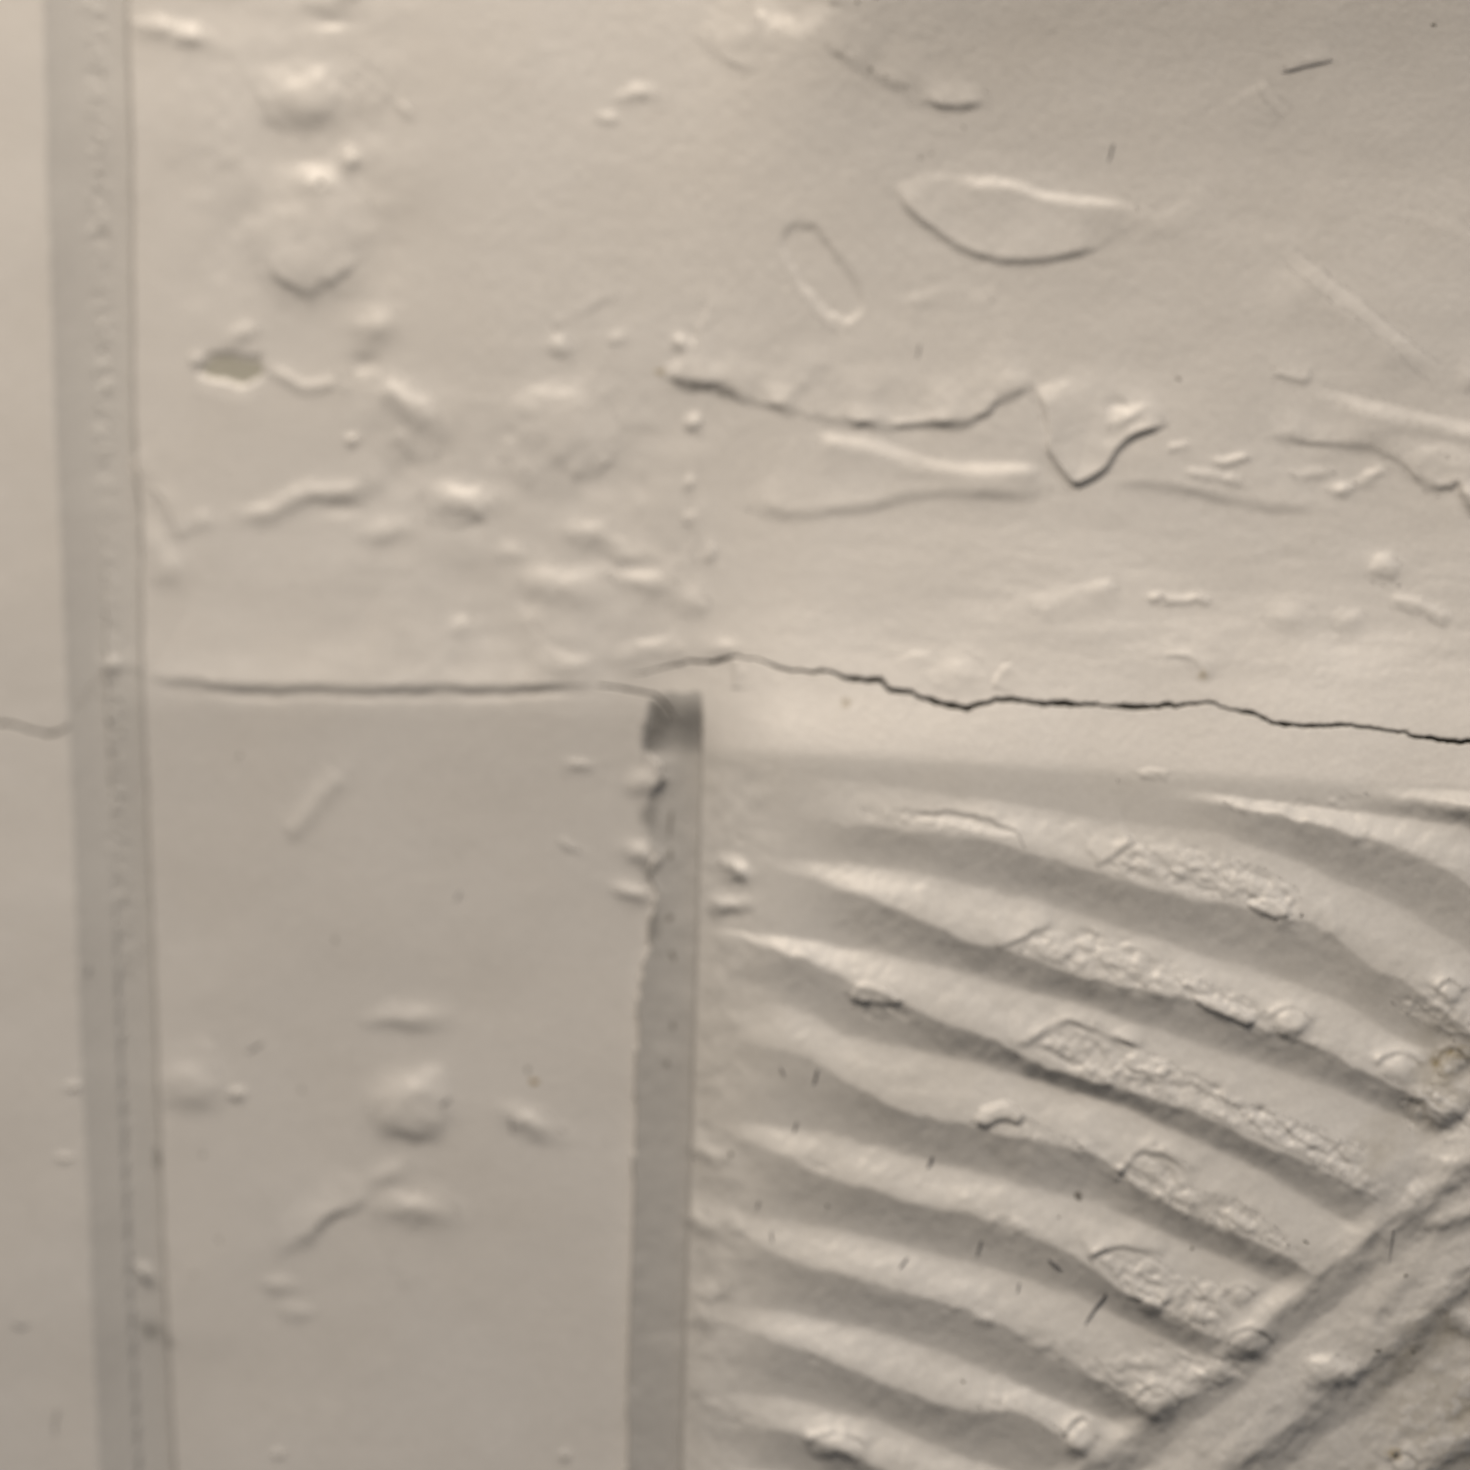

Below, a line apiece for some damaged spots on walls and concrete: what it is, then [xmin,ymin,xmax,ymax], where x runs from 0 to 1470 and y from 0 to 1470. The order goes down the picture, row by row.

peeling [188,324,266,403]
peeling [662,367,1470,525]
crack [0,670,106,738]
crack [146,654,1470,747]